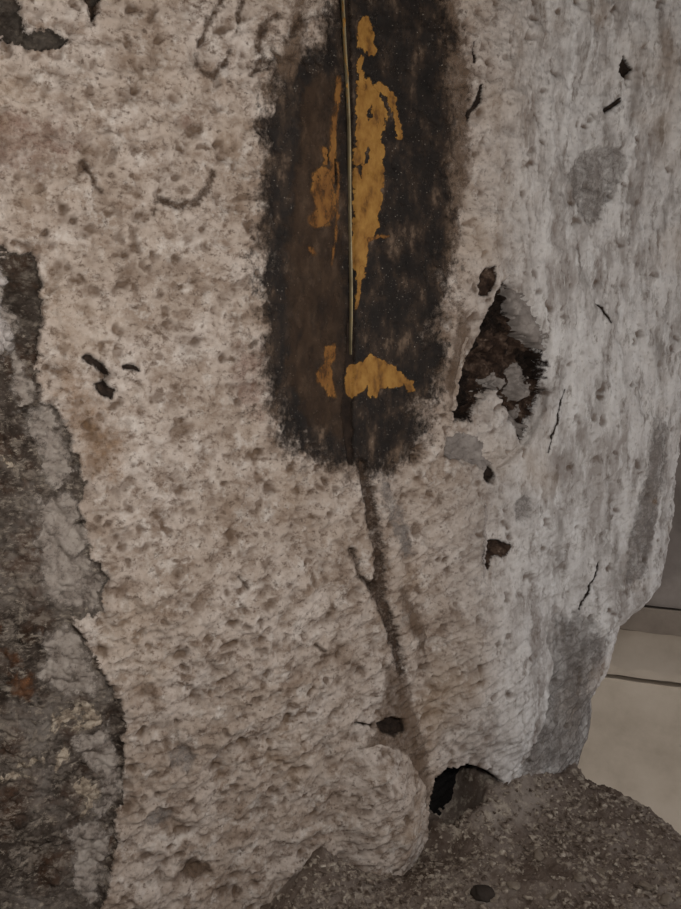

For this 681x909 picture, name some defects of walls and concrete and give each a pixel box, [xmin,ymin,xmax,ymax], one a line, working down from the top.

peeling [0,0,68,52]
crack [339,0,356,236]
corrosion [308,1,403,310]
water stain [252,0,472,478]
peeling [0,246,127,909]
corrosion [316,344,415,399]
crack [341,269,427,675]
spalling [444,266,556,483]
spalling [429,766,461,816]